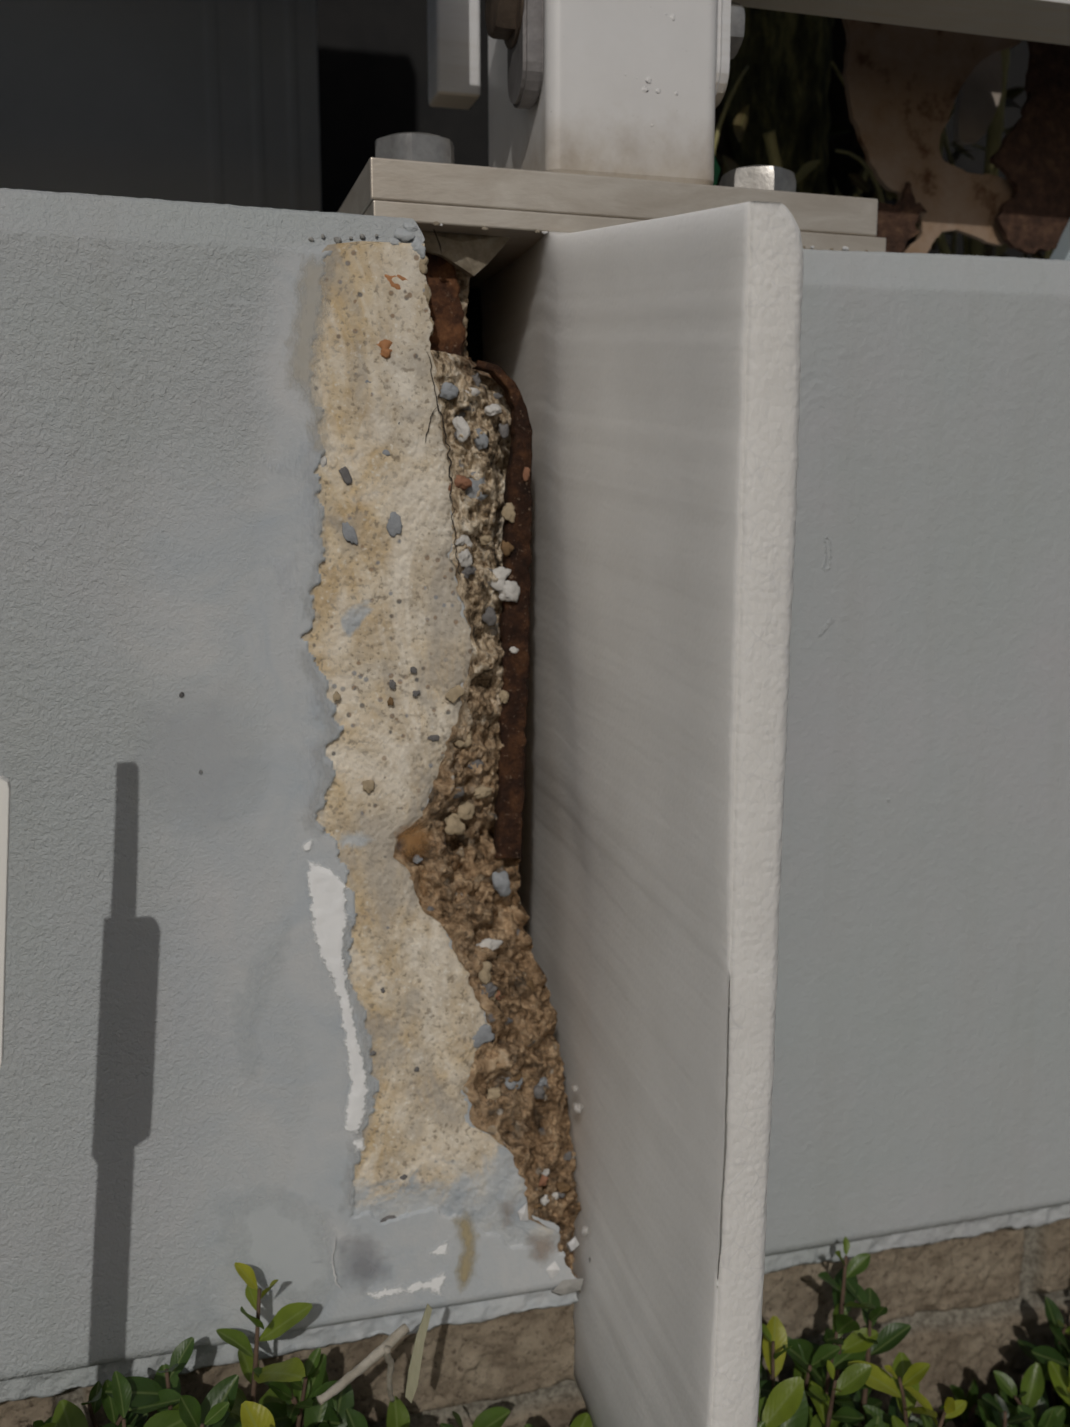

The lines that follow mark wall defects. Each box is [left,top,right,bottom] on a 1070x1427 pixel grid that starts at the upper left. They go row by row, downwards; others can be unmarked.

spalling [293,223,584,1300]
rust [424,253,533,859]
rust [459,1220,474,1282]